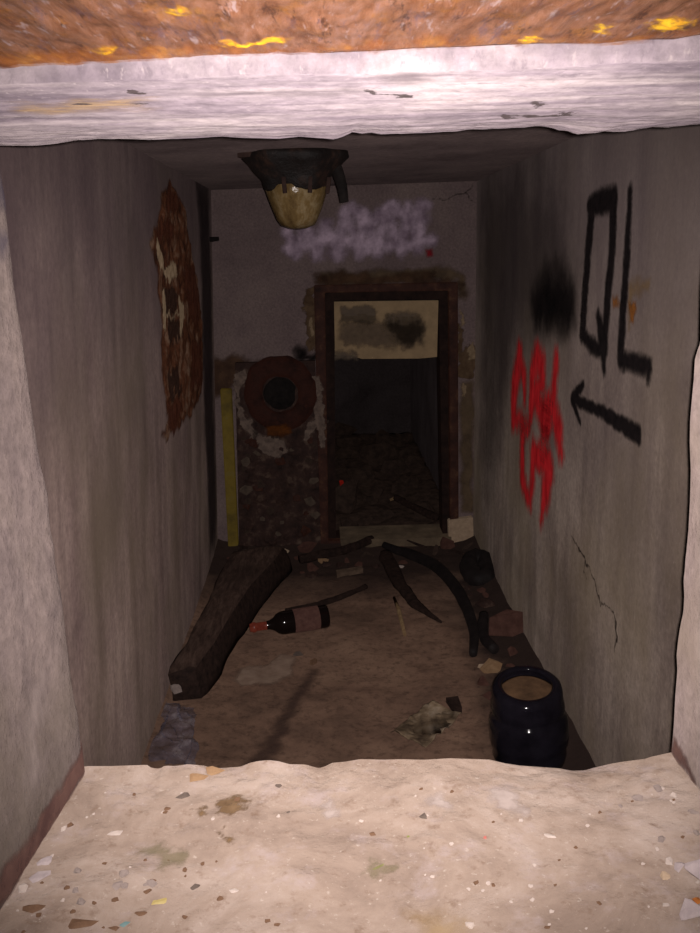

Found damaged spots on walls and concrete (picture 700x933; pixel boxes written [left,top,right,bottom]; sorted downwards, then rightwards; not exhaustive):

crack [573,539,618,648]